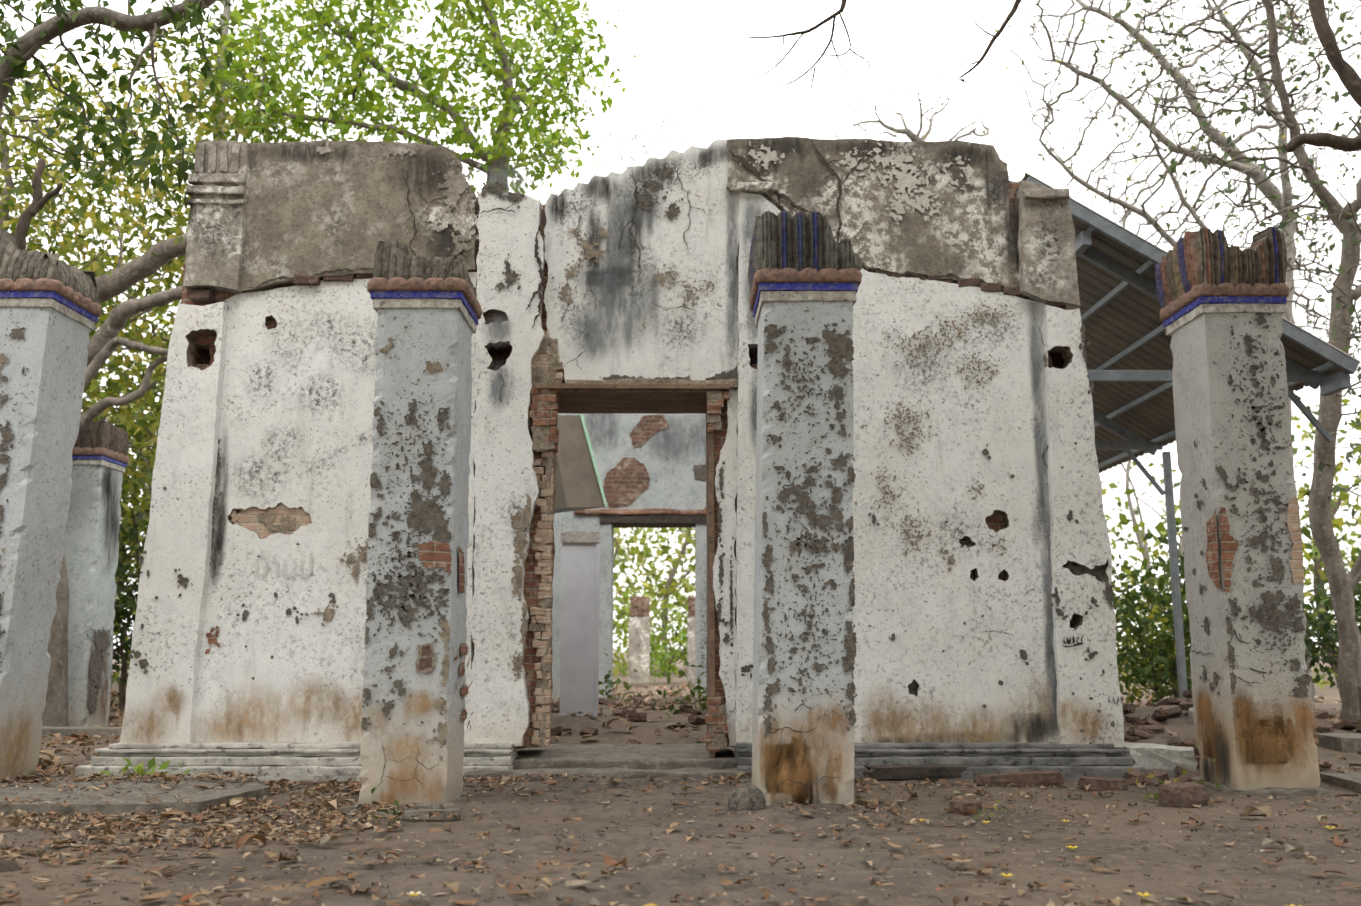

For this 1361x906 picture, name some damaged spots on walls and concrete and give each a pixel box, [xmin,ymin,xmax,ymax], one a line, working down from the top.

crack [400,169,447,256]
crack [479,159,706,328]
water stain [552,149,726,353]
peeling [740,138,795,171]
peeling [826,136,977,226]
flaking render [5,327,25,340]
peeling [375,326,408,358]
flaking render [209,438,312,578]
spalling [603,414,670,508]
flaking render [1192,312,1314,699]
flaking render [339,360,473,761]